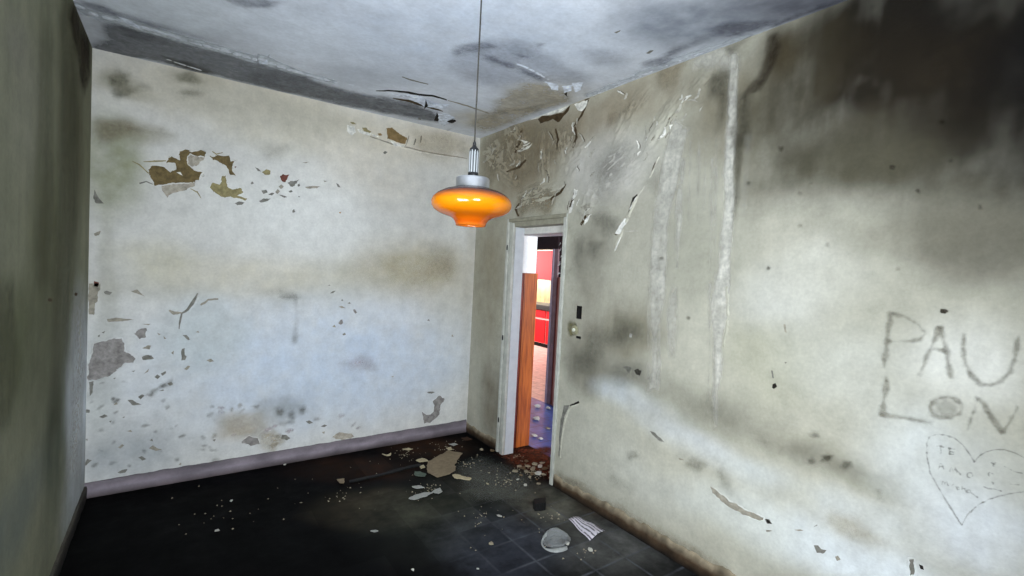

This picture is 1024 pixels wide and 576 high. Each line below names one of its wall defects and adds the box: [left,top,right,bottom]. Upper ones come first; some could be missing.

water stain [716,19,790,89]
peeling [347,122,408,154]
peeling [508,28,771,225]
flaking render [132,148,340,205]
flaking render [87,318,173,395]
flaking render [421,391,445,424]
peeling [558,401,579,458]
spalling [709,486,772,532]